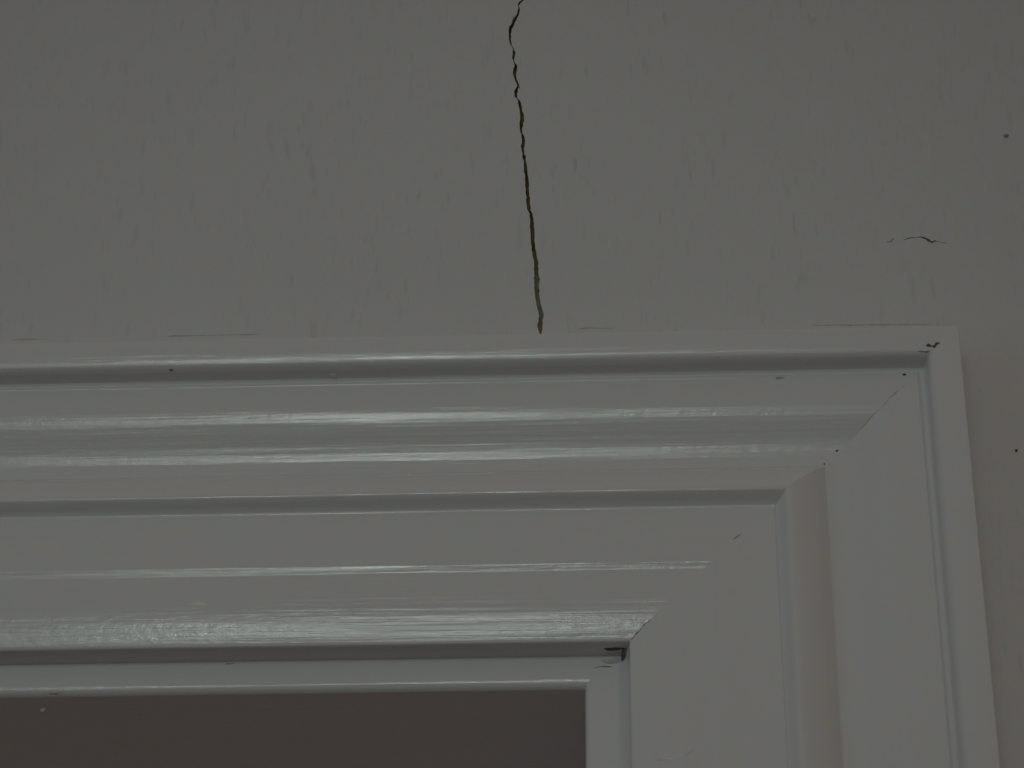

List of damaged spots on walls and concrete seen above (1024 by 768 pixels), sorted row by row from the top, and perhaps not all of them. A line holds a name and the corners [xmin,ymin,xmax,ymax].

crack [509,0,544,334]
crack [888,235,944,243]